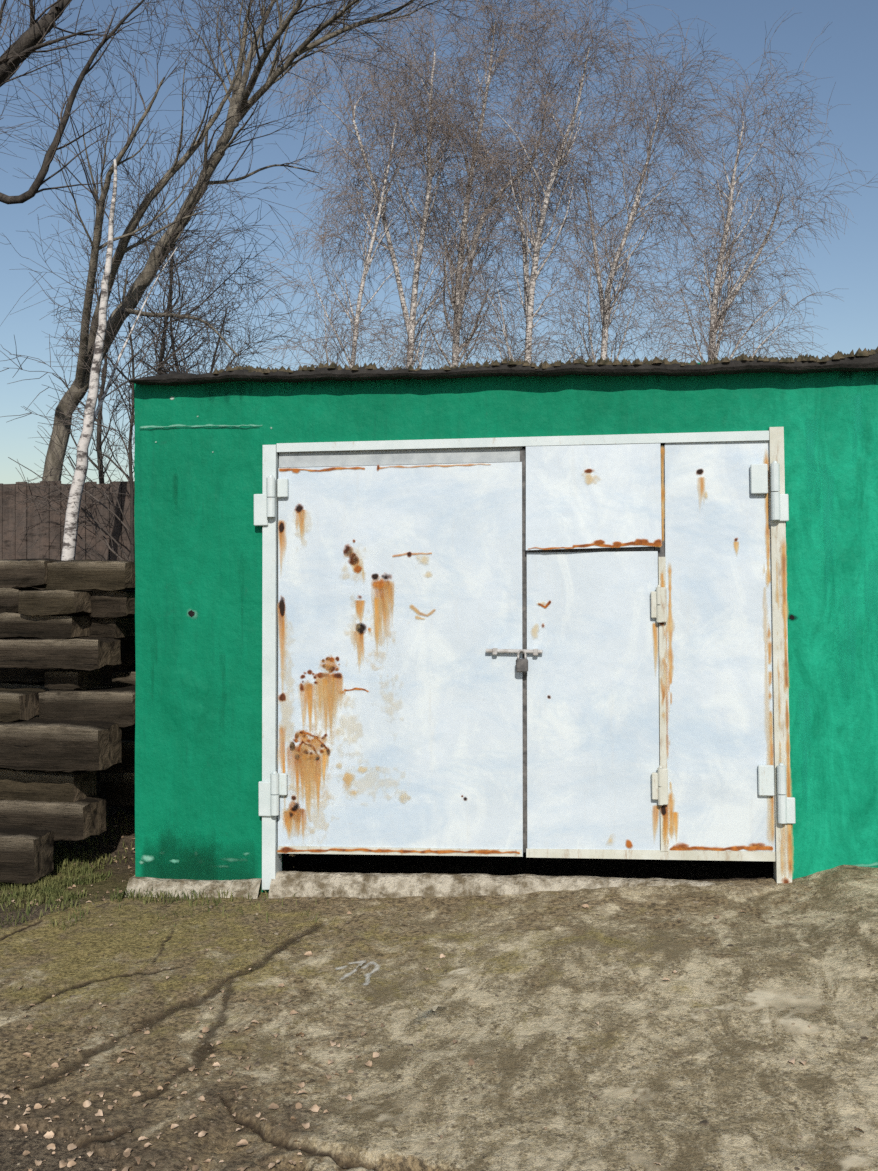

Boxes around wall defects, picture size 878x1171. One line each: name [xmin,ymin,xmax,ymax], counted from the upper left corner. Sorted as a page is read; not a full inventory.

rust [279,464,491,473]
rust [279,504,305,552]
rust [344,540,393,658]
rust [393,552,432,577]
rust [653,567,673,745]
rust [765,457,791,797]
rust [277,657,520,854]
rust [653,783,793,883]